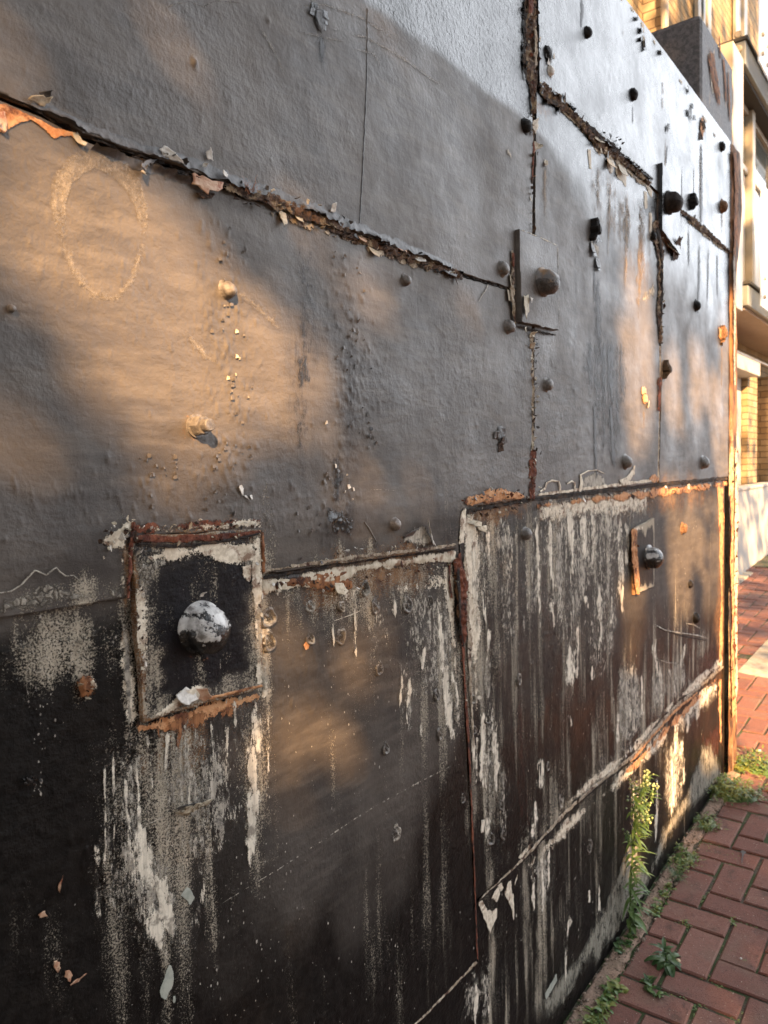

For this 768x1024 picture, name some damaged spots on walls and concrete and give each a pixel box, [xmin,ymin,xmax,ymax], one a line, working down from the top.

peeling [27,90,53,107]
peeling [141,145,464,284]
corrosion [719,151,739,385]
leakage [94,623,270,958]
corrosion [125,433,741,718]
leakage [465,958,497,1024]
peeling [479,874,525,939]
leakage [354,500,719,839]
leakage [521,797,559,849]
leakage [531,843,553,912]
peeling [519,485,725,867]
leakage [539,685,723,1018]